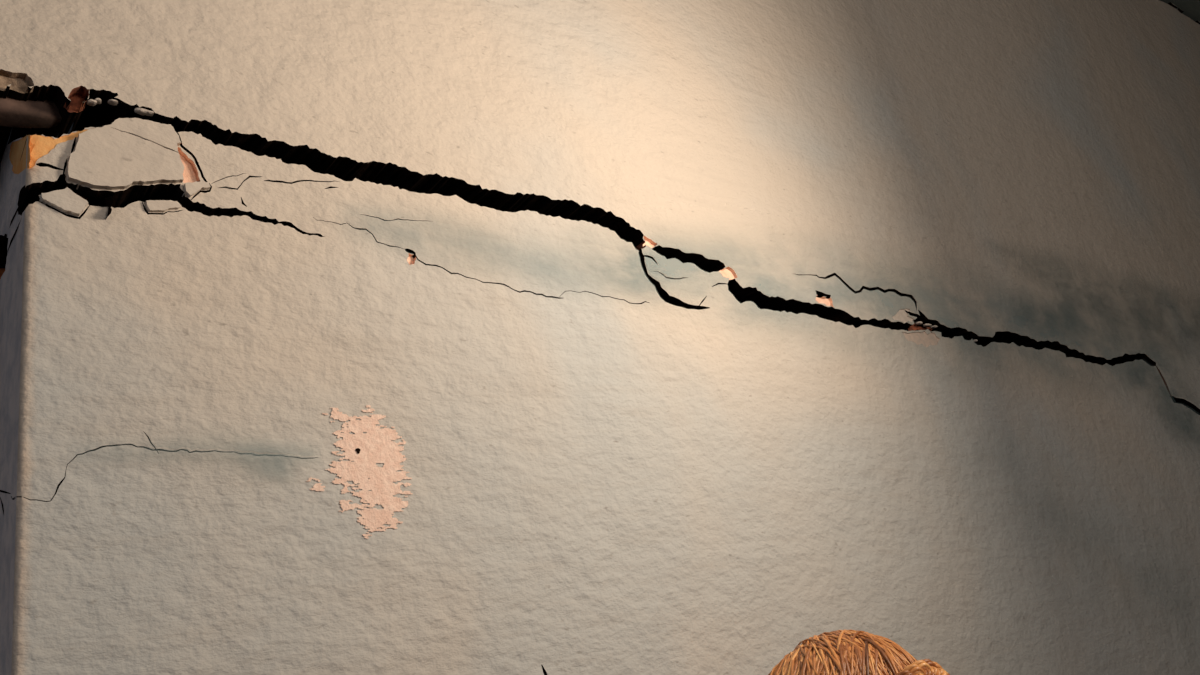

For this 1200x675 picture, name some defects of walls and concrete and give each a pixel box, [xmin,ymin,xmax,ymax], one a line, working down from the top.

spalling [0,69,118,219]
crack [0,84,1200,415]
leakage [645,256,693,275]
crack [0,431,318,514]
peeling [308,405,413,539]